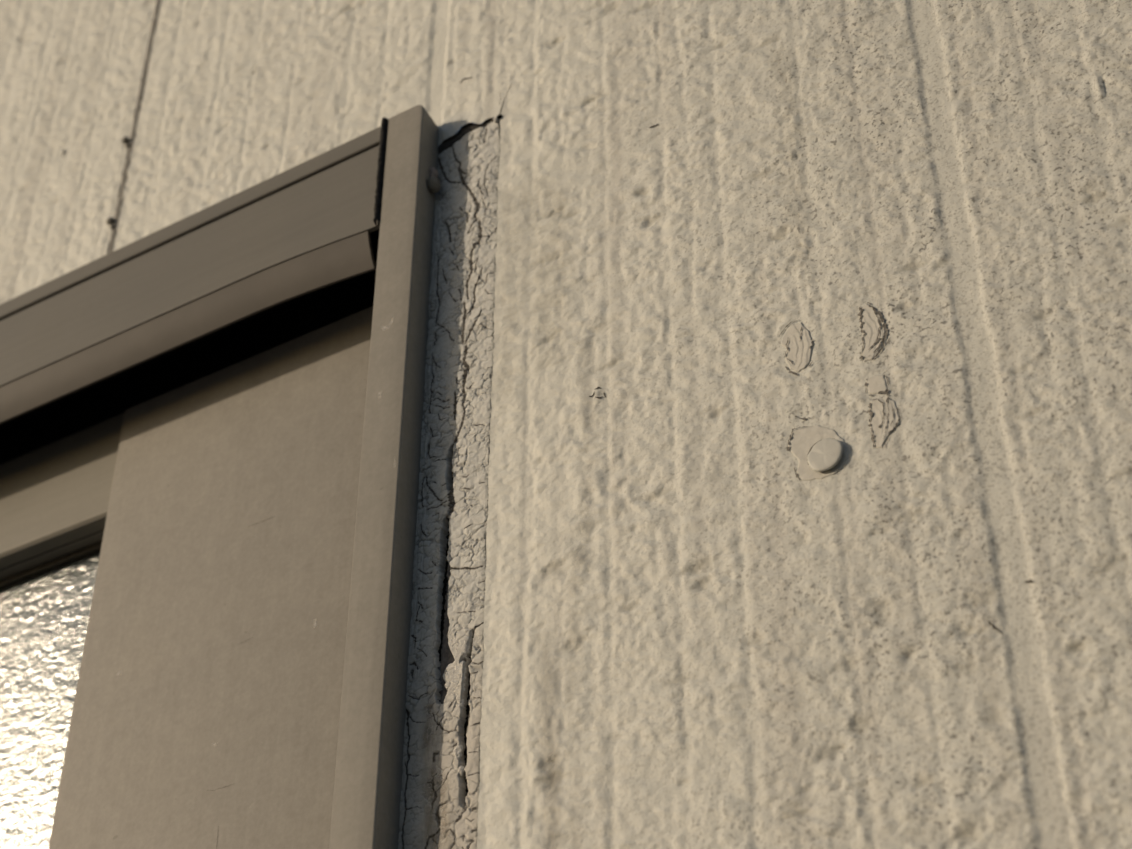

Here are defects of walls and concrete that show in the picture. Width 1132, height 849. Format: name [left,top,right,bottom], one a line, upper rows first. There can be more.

spalling [780,321,814,376]
spalling [857,302,888,362]
spalling [864,375,901,448]
crack [401,84,511,849]
spalling [787,416,848,481]